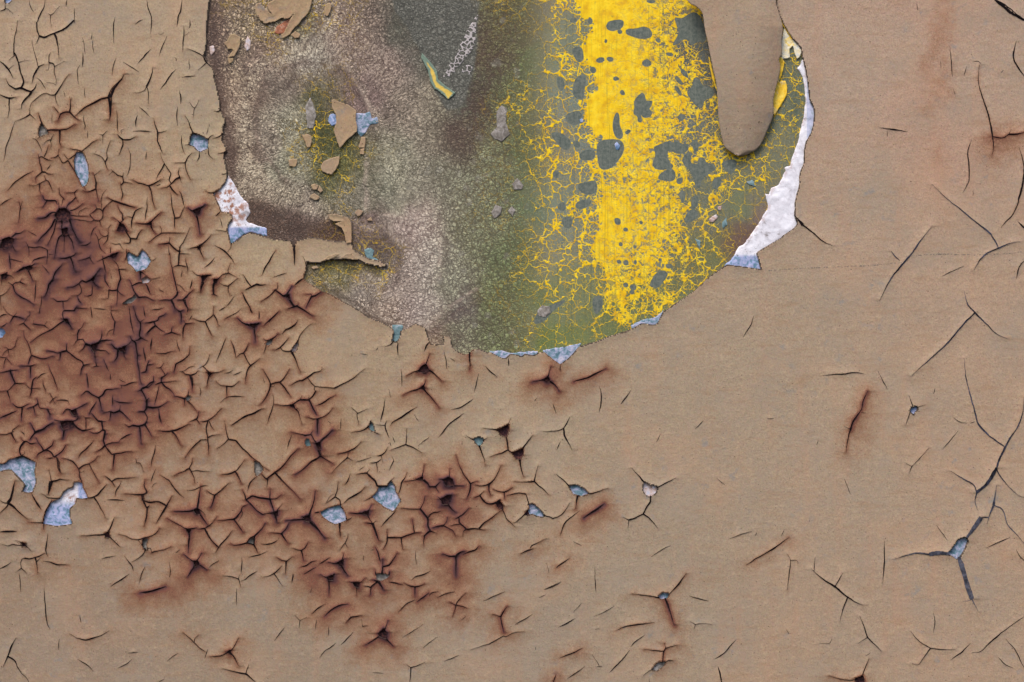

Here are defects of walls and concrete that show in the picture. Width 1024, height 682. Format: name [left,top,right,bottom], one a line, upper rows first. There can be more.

crack [995,0,1024,75]
peeling [204,0,814,364]
peeling [127,250,151,283]
peeling [0,456,36,492]
peeling [44,482,87,526]
rust [0,84,515,655]
crack [0,0,631,682]
peeling [373,481,401,511]
rust [845,389,871,452]
crack [879,51,1024,610]
crack [553,574,712,682]
crack [730,531,880,682]